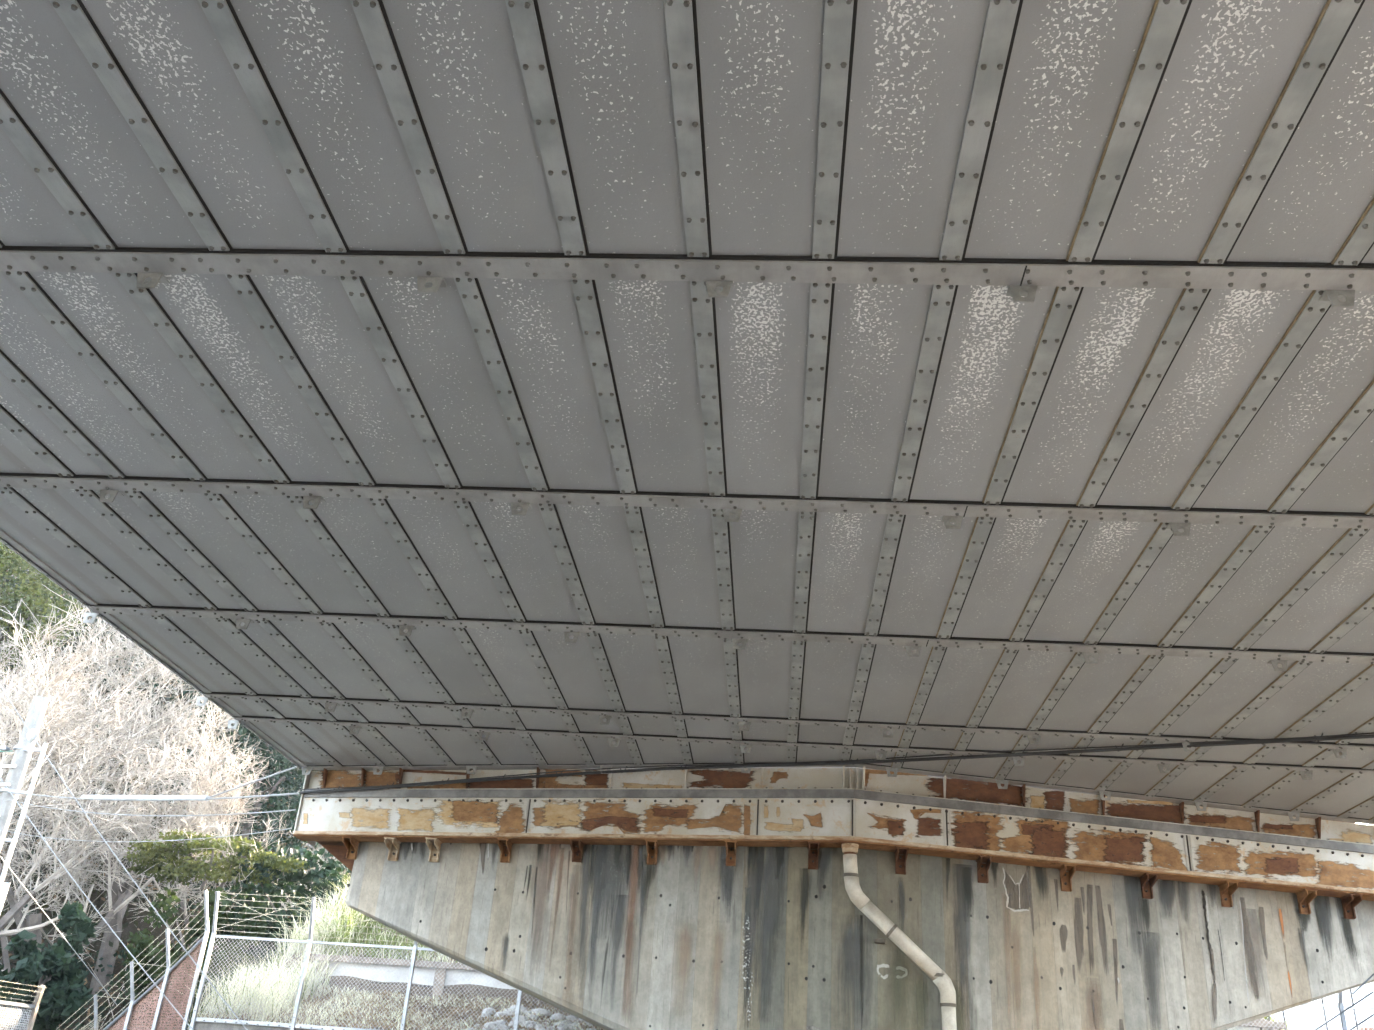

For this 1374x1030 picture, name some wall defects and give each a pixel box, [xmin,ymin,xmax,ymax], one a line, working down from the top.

leakage [480,843,496,873]
corrosion [319,768,823,965]
leakage [580,844,694,989]
leakage [720,847,784,1020]
leakage [801,847,830,932]
leakage [842,915,865,1021]
leakage [946,858,972,1014]
leakage [1026,866,1120,1001]
corrosion [865,769,1374,889]
leakage [1124,876,1188,1022]
leakage [1232,893,1267,1003]
leakage [1292,893,1355,963]